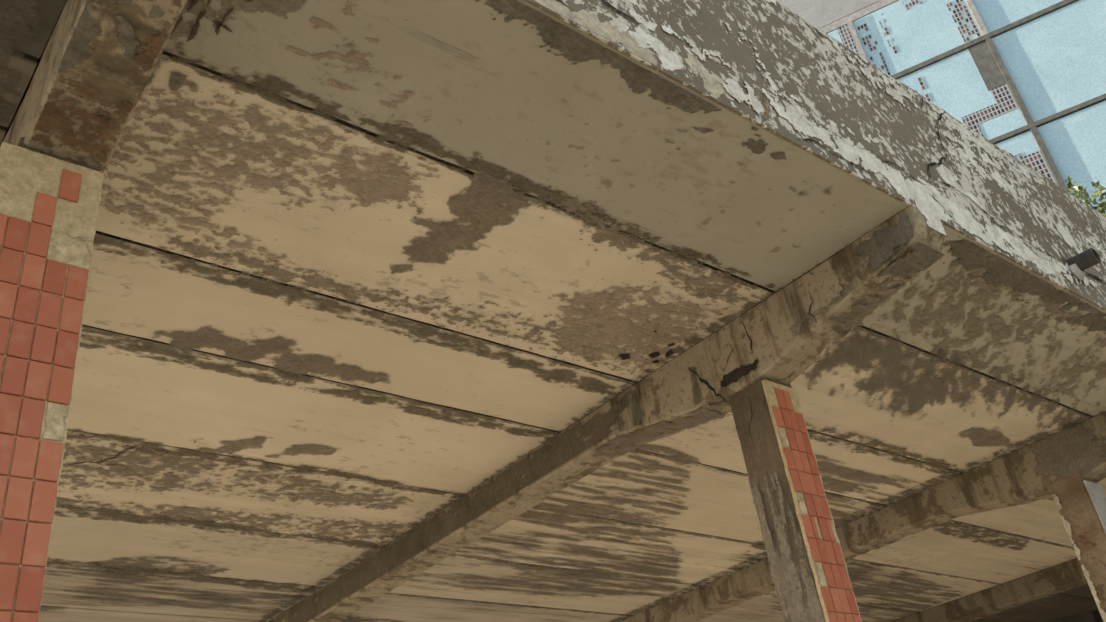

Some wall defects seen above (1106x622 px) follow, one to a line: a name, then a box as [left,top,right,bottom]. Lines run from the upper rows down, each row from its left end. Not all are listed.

peeling [32,0,758,378]
leakage [45,50,824,622]
crack [688,323,770,448]
peeling [475,0,1106,407]
crack [797,90,1106,284]